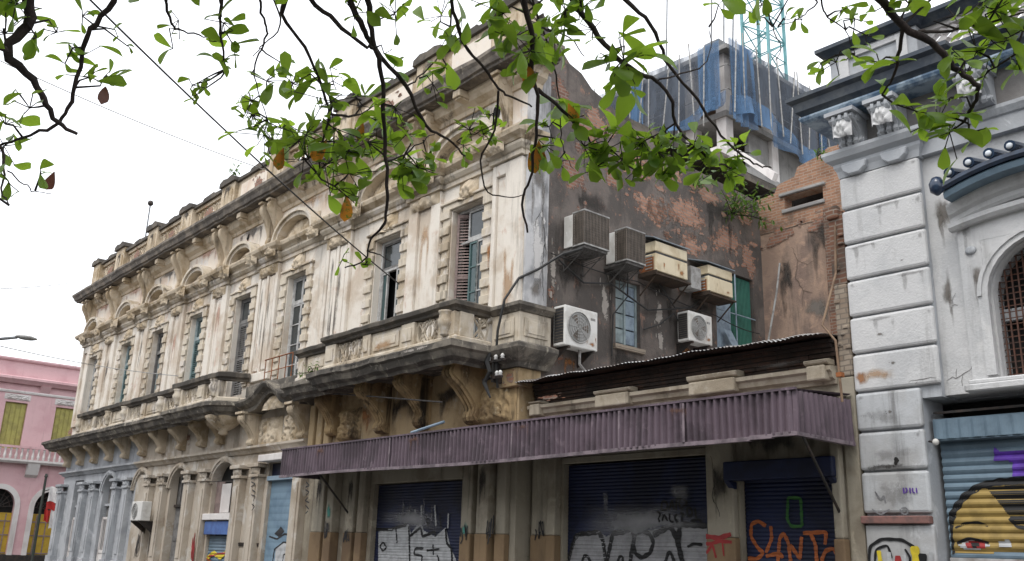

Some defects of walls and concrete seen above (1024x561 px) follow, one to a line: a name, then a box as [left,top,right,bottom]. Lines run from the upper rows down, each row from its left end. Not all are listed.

flaking render [558,107,802,279]
peeling [600,273,611,321]
peeling [654,290,663,357]